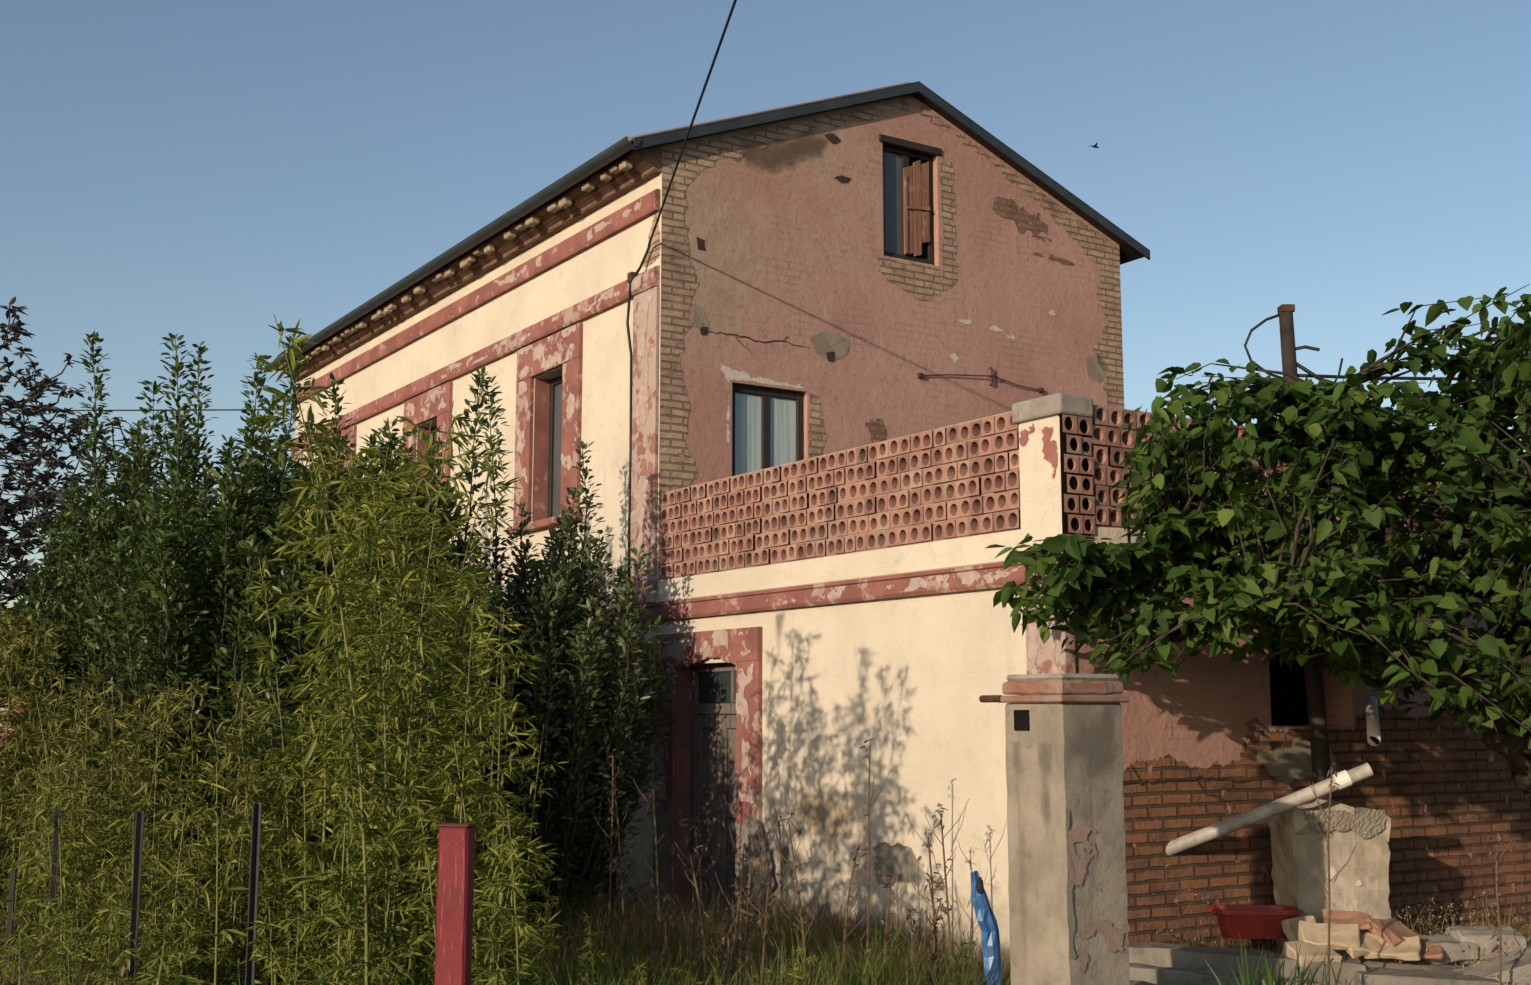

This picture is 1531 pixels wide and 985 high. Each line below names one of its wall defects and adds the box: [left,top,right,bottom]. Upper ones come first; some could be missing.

damp [744,135,828,169]
crack [707,331,808,353]
flaking render [405,100,1124,558]
peeling [823,586,846,599]
peeling [885,566,1021,592]
spalling [657,629,802,930]
spalling [874,842,922,887]
flaking render [1123,717,1314,952]
flaking render [1328,705,1531,944]
spalling [1068,883,1076,959]